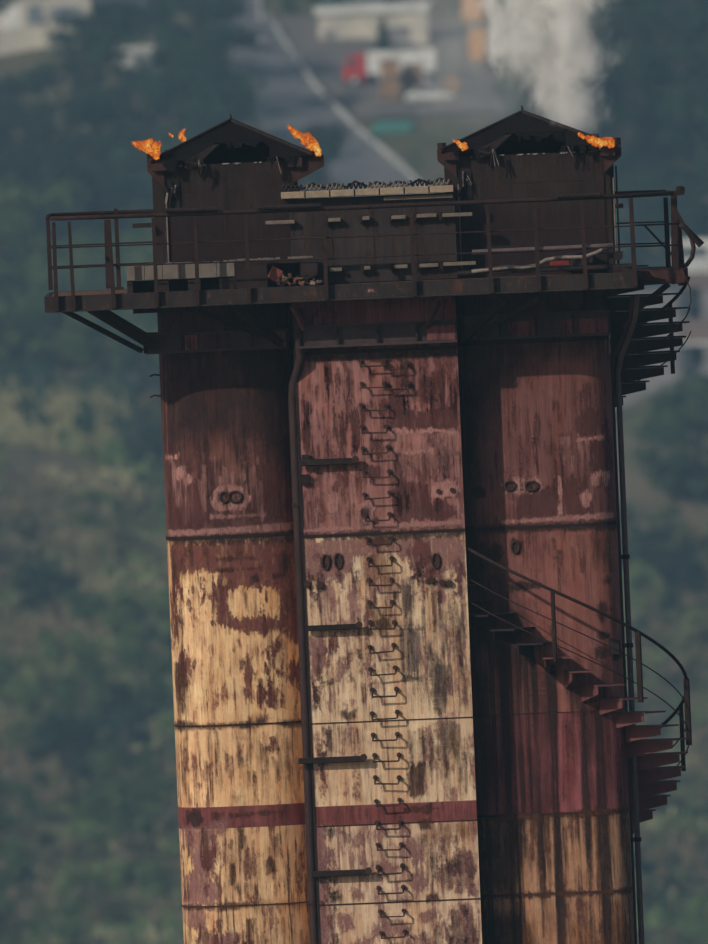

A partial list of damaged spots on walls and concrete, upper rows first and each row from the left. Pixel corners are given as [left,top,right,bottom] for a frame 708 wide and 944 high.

peeling [301,360,461,523]
peeling [165,454,205,502]
rust [210,460,252,511]
peeling [167,467,466,717]
rust [175,658,267,731]
rust [262,736,279,776]
rust [185,809,282,871]
rust [183,863,259,912]
peeling [316,824,354,944]
peeling [355,837,479,944]
rust [480,887,631,908]
rust [246,919,254,944]